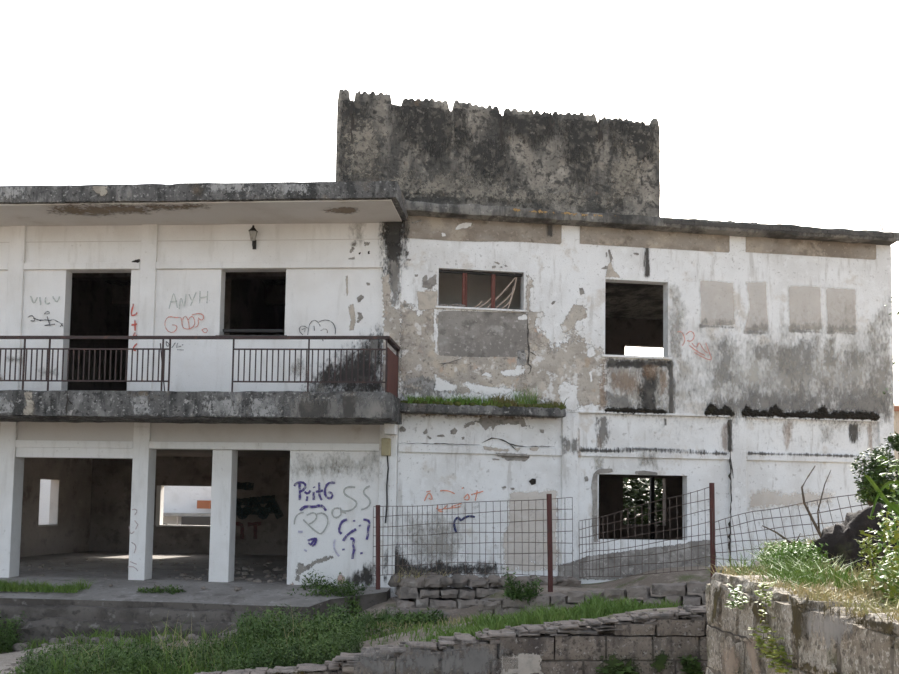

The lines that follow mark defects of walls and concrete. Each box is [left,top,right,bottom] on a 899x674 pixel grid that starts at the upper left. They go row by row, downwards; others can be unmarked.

damp [339,100,369,181]
damp [389,105,660,188]
damp [0,187,25,199]
damp [279,329,387,418]
peeling [346,276,364,330]
damp [380,220,409,306]
flaking render [403,216,562,244]
peeling [423,416,544,440]
peeling [381,274,608,414]
spalling [483,446,539,462]
crack [726,422,734,562]
damp [711,338,892,443]